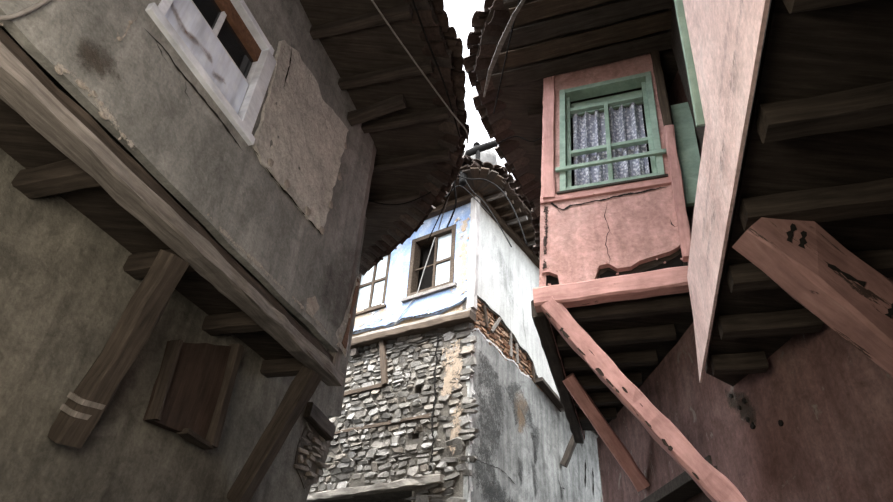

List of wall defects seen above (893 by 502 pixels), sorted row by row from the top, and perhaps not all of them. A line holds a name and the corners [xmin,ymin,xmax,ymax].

spalling [207,214,470,357]
crack [544,187,666,263]
spalling [640,253,683,273]
flaking render [441,297,543,397]
flaking render [293,422,331,489]
peeling [447,403,474,502]
damp [472,351,539,502]